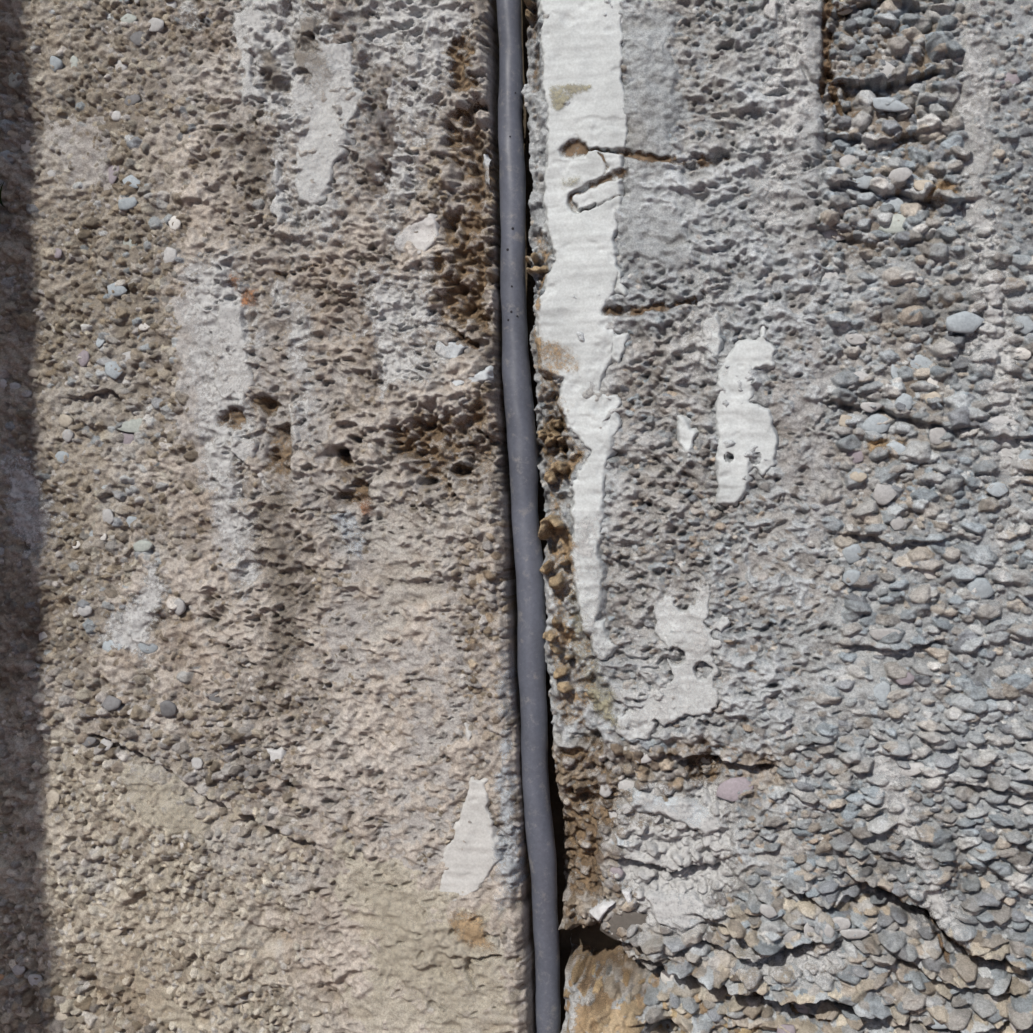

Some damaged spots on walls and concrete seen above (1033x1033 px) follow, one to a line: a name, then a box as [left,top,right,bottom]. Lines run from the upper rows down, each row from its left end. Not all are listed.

damp [179,0,201,30]
damp [231,0,472,257]
damp [550,84,591,110]
crack [819,0,843,116]
damp [353,256,449,398]
damp [568,515,736,736]
crack [864,882,979,964]